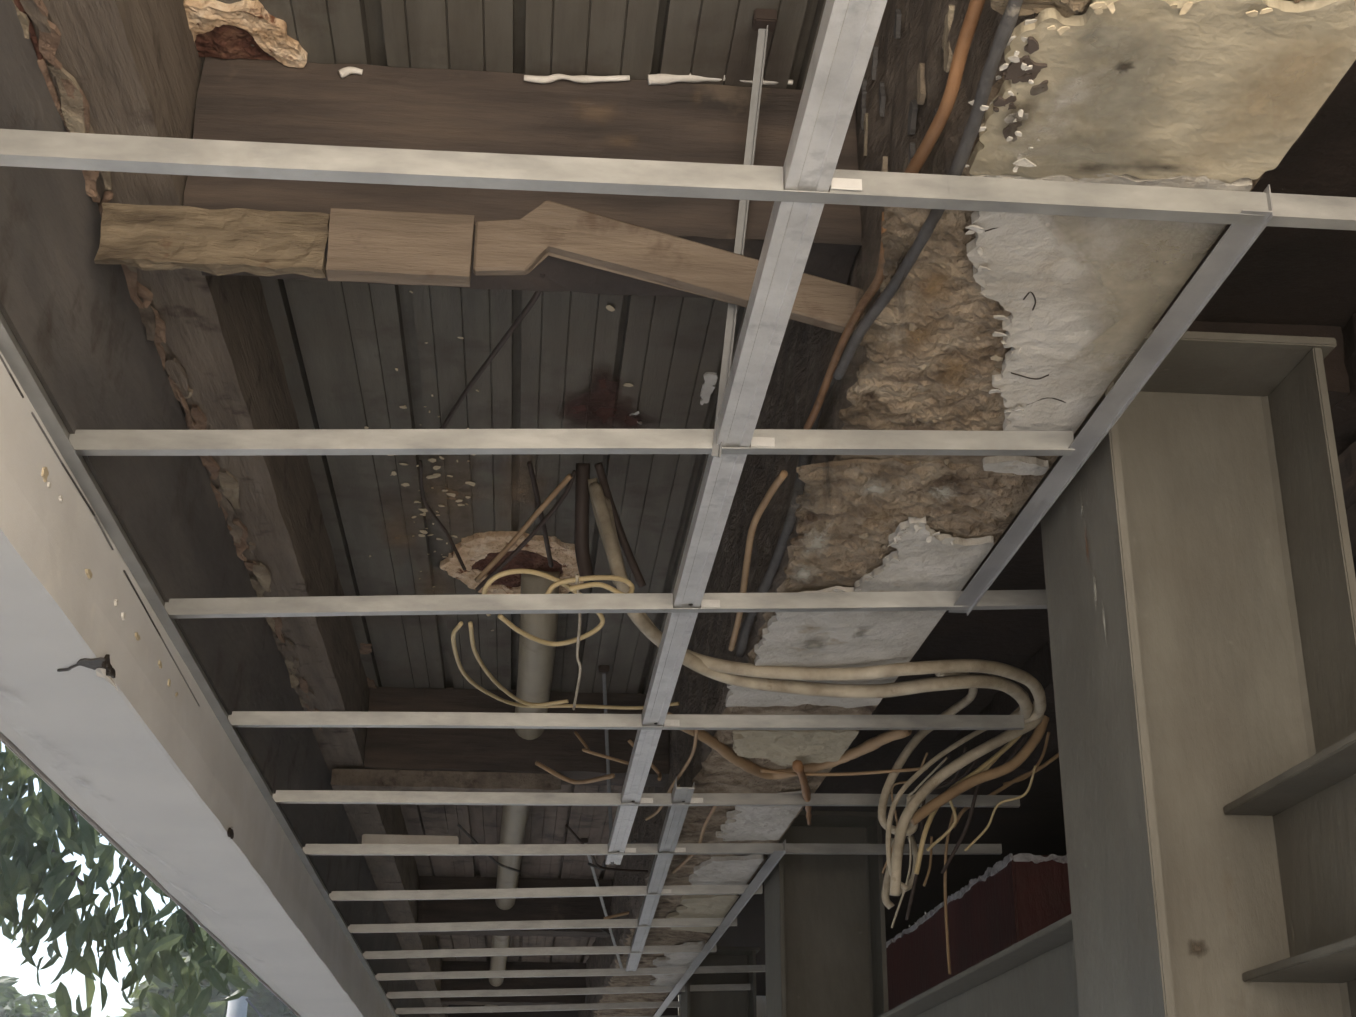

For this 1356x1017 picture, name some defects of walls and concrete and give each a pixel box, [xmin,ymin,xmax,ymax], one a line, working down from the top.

spalling [183,0,308,68]
peeling [860,46,888,172]
peeling [907,63,938,165]
peeling [942,5,955,73]
peeling [968,0,1115,172]
peeling [1170,1,1193,15]
peeling [1246,8,1273,17]
spalling [839,207,1024,431]
spalling [388,454,584,594]
spalling [784,457,1037,592]